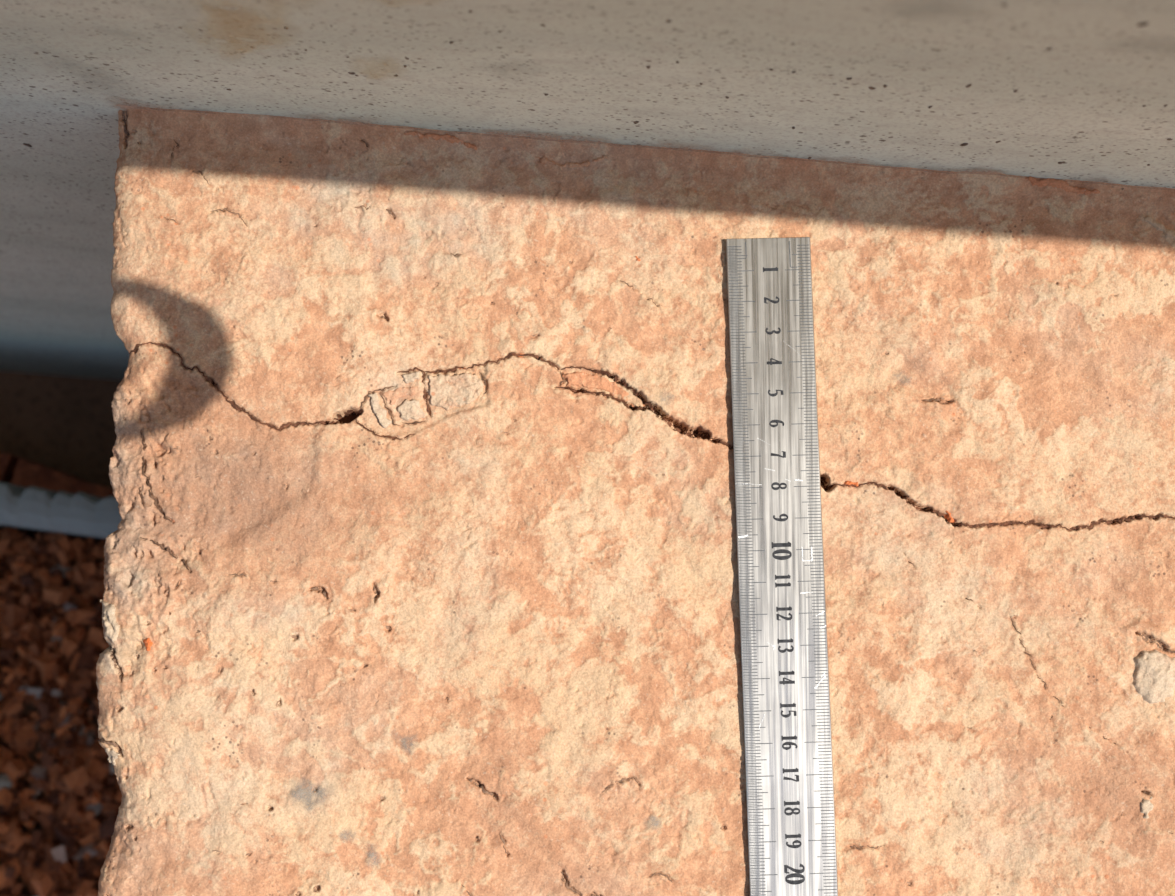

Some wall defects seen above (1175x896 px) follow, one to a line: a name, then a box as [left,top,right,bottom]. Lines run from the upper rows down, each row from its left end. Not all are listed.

crack [129,342,733,449]
crack [139,432,190,590]
crack [820,477,1174,531]
spalling [1133,646,1175,704]